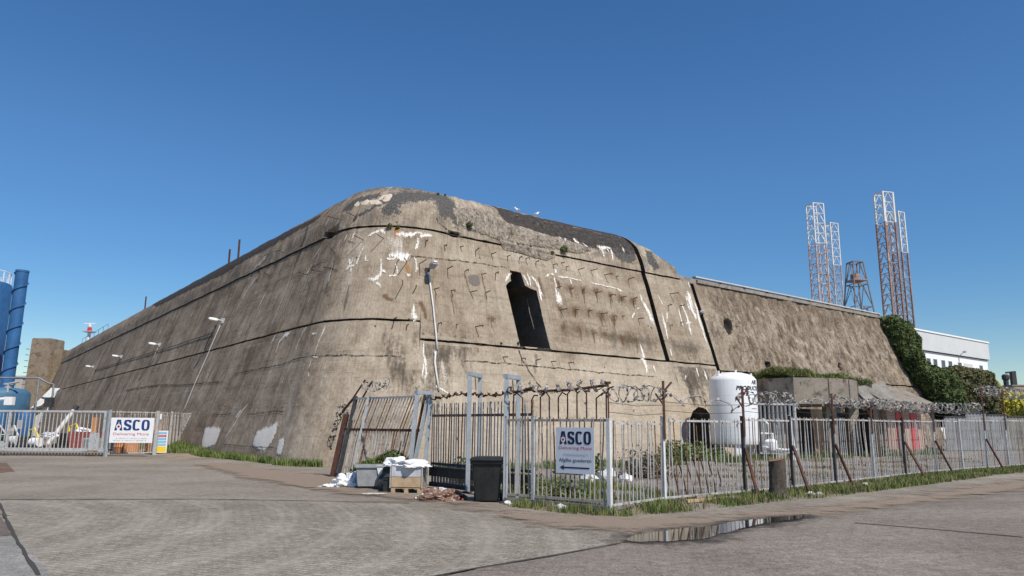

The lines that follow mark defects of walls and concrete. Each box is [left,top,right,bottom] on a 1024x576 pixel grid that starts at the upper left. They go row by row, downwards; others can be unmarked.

water stain [368,229,432,286]
spalling [153,190,659,307]
water stain [523,269,621,327]
water stain [632,282,707,356]